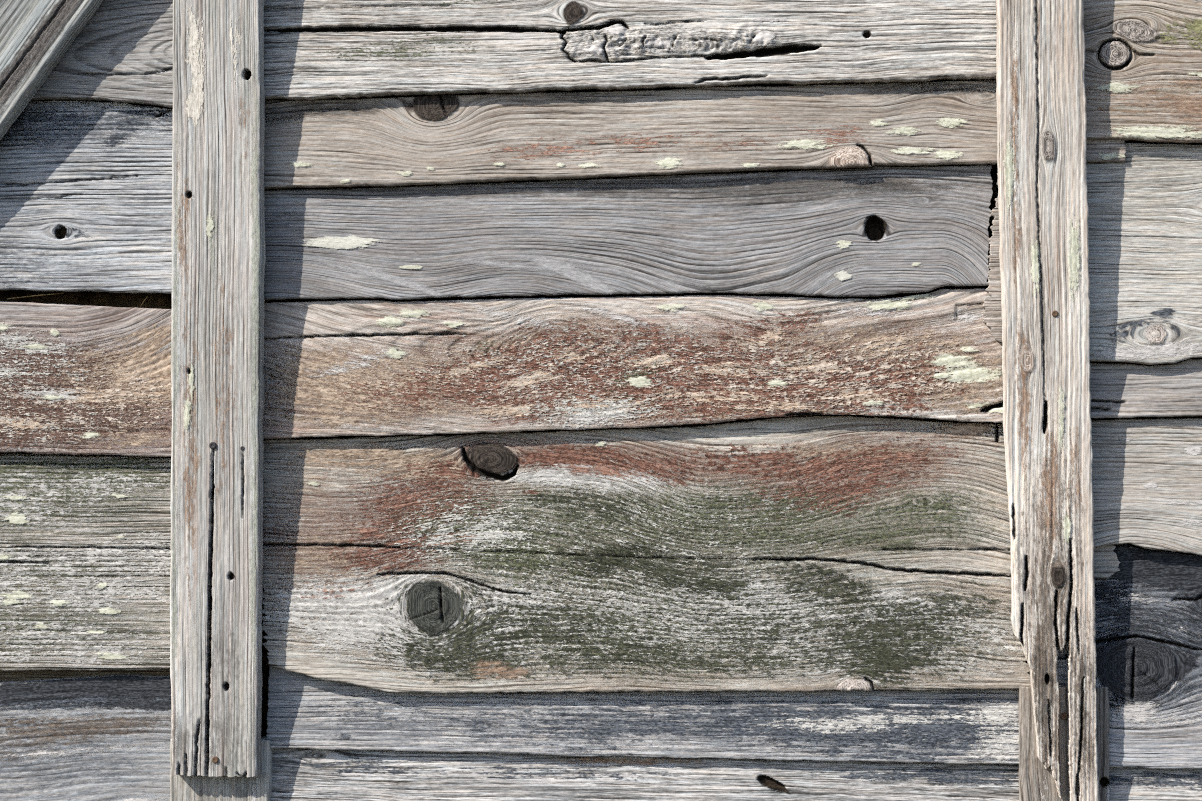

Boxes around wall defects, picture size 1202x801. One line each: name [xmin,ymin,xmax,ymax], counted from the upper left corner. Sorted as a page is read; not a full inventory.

crack [264,5,820,83]
water stain [1010,48,1022,278]
crack [178,451,247,778]
crack [263,544,524,621]
water stain [263,304,1202,801]
crack [708,506,1029,645]
crack [1054,541,1202,697]
crack [1048,688,1084,772]